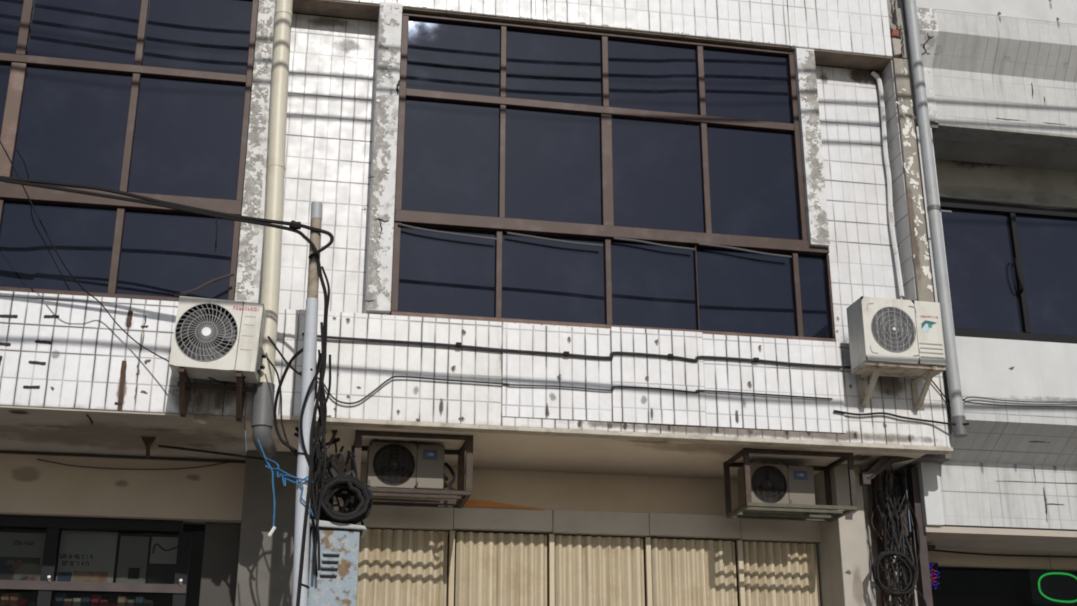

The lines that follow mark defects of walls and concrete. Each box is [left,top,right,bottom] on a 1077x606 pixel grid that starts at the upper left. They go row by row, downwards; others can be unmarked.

peeling [235,0,275,300]
peeling [366,5,830,309]
spalling [889,8,909,75]
peeling [895,68,939,293]
peeling [917,7,937,30]
crack [921,33,934,56]